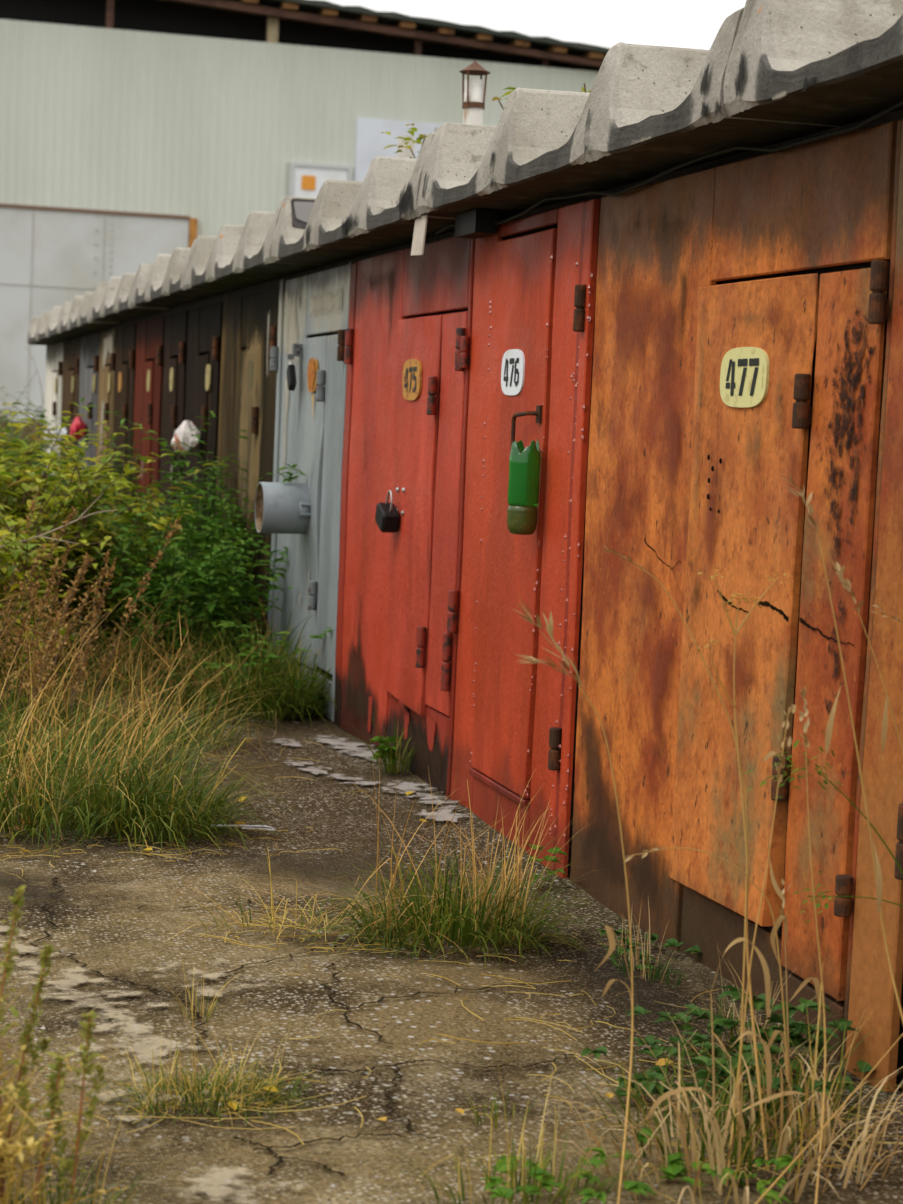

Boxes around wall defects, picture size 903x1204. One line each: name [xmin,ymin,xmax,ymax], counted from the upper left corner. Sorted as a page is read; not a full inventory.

rust [816,305,875,559]
rust [706,490,715,557]
crack [644,539,681,591]
crack [717,590,854,646]
rust [825,581,845,714]